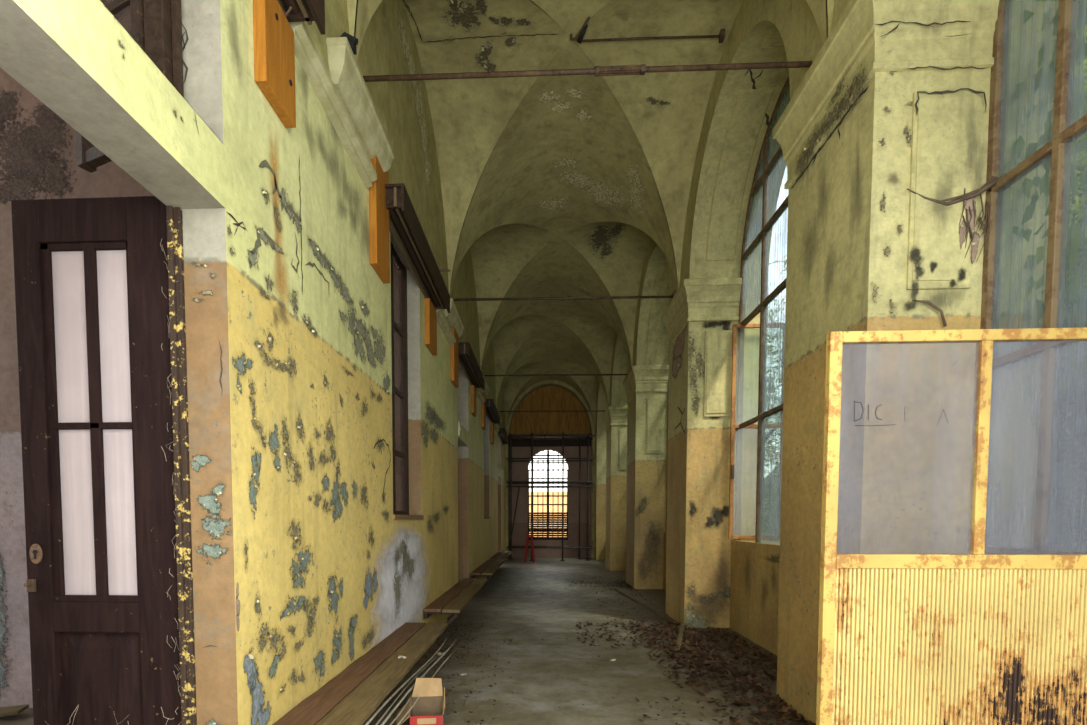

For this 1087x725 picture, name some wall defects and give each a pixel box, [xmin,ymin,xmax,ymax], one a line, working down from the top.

peeling [228,187,391,417]
mould [905,247,937,310]
peeling [191,454,211,472]
peeling [232,327,369,522]
peeling [419,402,445,447]
peeling [0,553,15,698]
peeling [195,483,232,565]
peeling [244,519,378,725]
efflorescence [377,532,425,643]
peeling [393,534,416,616]